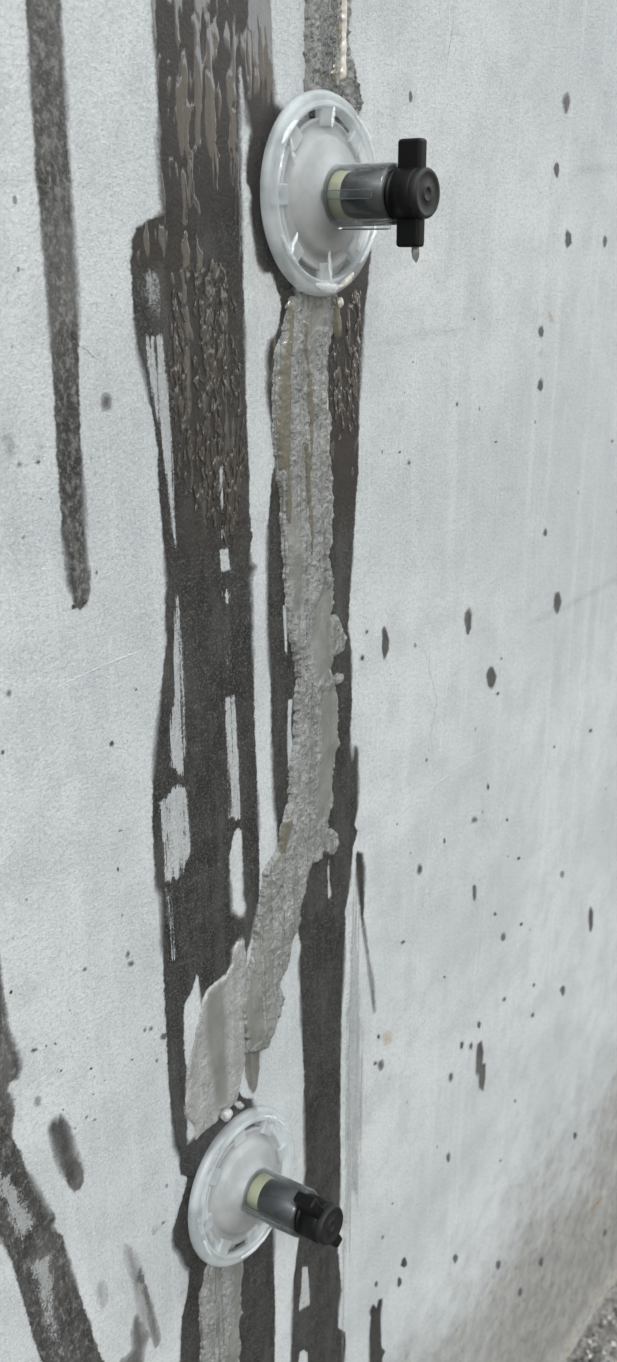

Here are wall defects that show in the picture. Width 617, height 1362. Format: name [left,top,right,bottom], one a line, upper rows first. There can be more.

water stain [26,0,91,610]
water stain [130,0,297,1362]
water stain [291,233,375,1362]
water stain [382,627,390,658]
water stain [0,968,104,1362]
water stain [123,1272,158,1362]
water stain [369,1282,385,1362]